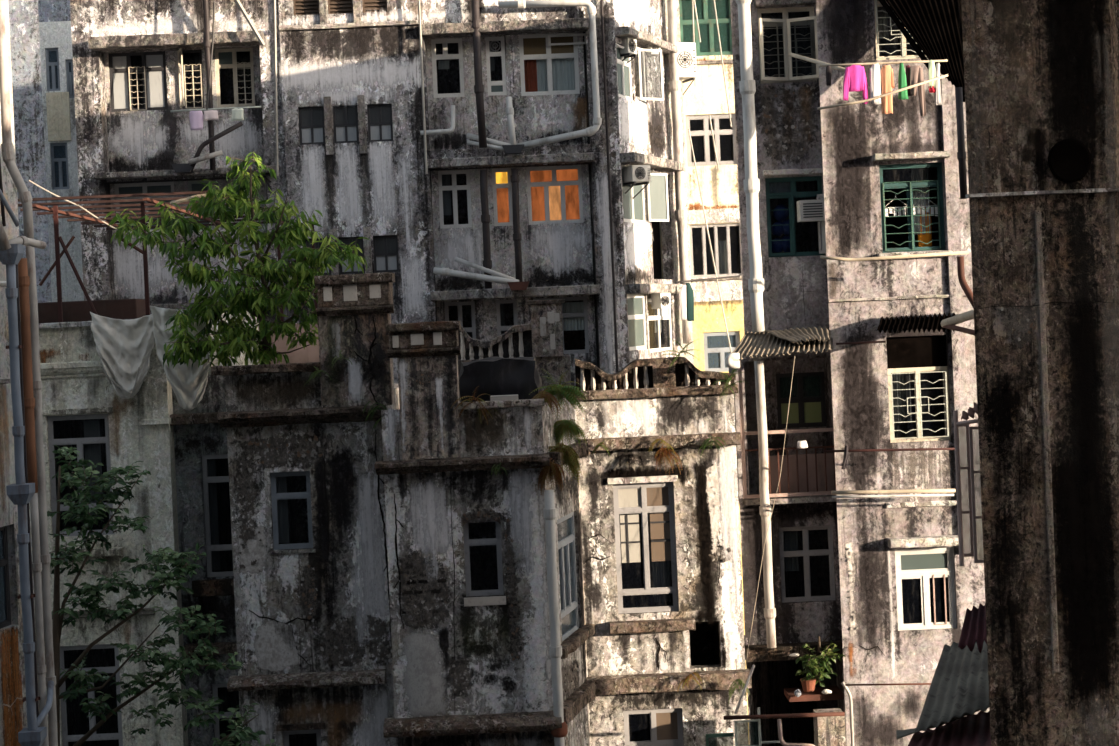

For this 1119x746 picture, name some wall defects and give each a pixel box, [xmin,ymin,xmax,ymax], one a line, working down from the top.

water stain [280,0,485,315]
water stain [527,130,589,146]
water stain [596,0,665,153]
crack [354,316,378,405]
crack [374,432,404,646]
water stain [314,427,562,707]
water stain [843,333,895,680]
rust [0,628,24,746]